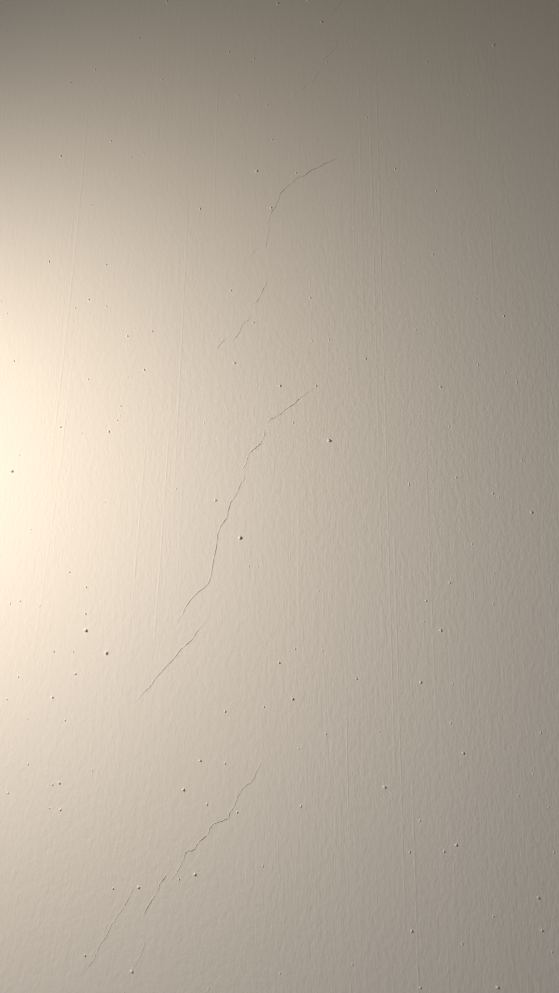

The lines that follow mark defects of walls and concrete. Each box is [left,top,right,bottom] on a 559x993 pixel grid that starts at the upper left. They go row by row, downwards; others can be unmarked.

crack [134,388,314,703]
crack [84,758,263,972]